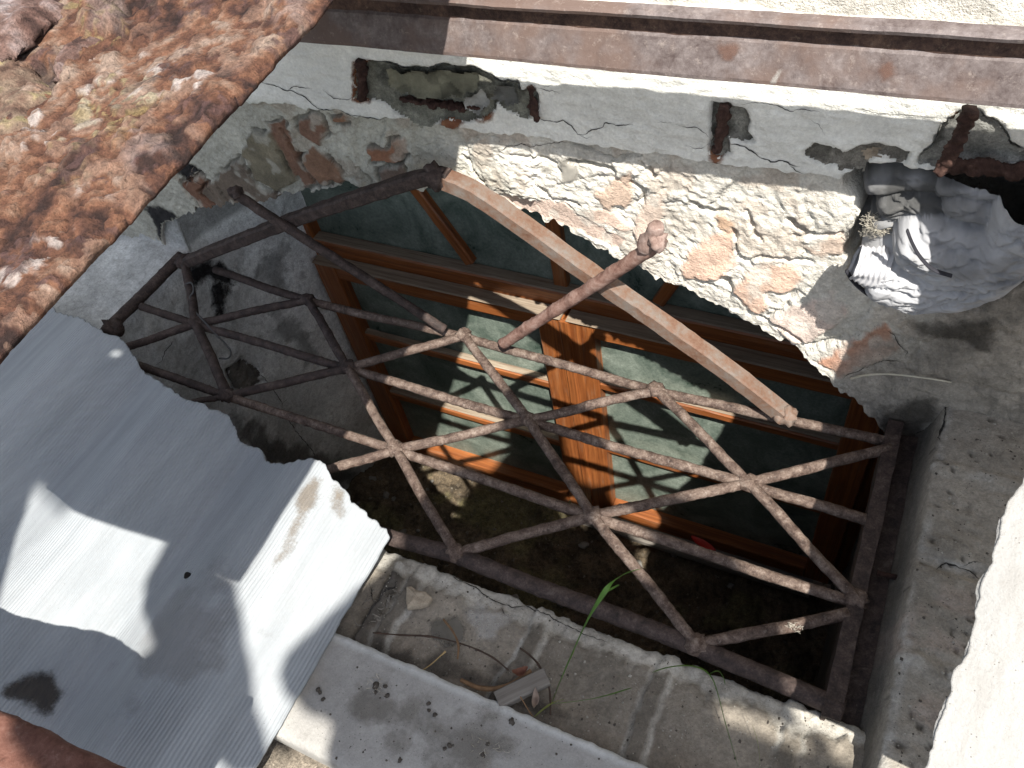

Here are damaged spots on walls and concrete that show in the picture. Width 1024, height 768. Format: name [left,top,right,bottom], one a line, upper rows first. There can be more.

crack [262,82,404,120]
corrosion [352,60,374,104]
spalling [354,57,541,128]
crack [487,115,629,150]
crack [655,122,803,174]
spalling [805,104,1024,182]